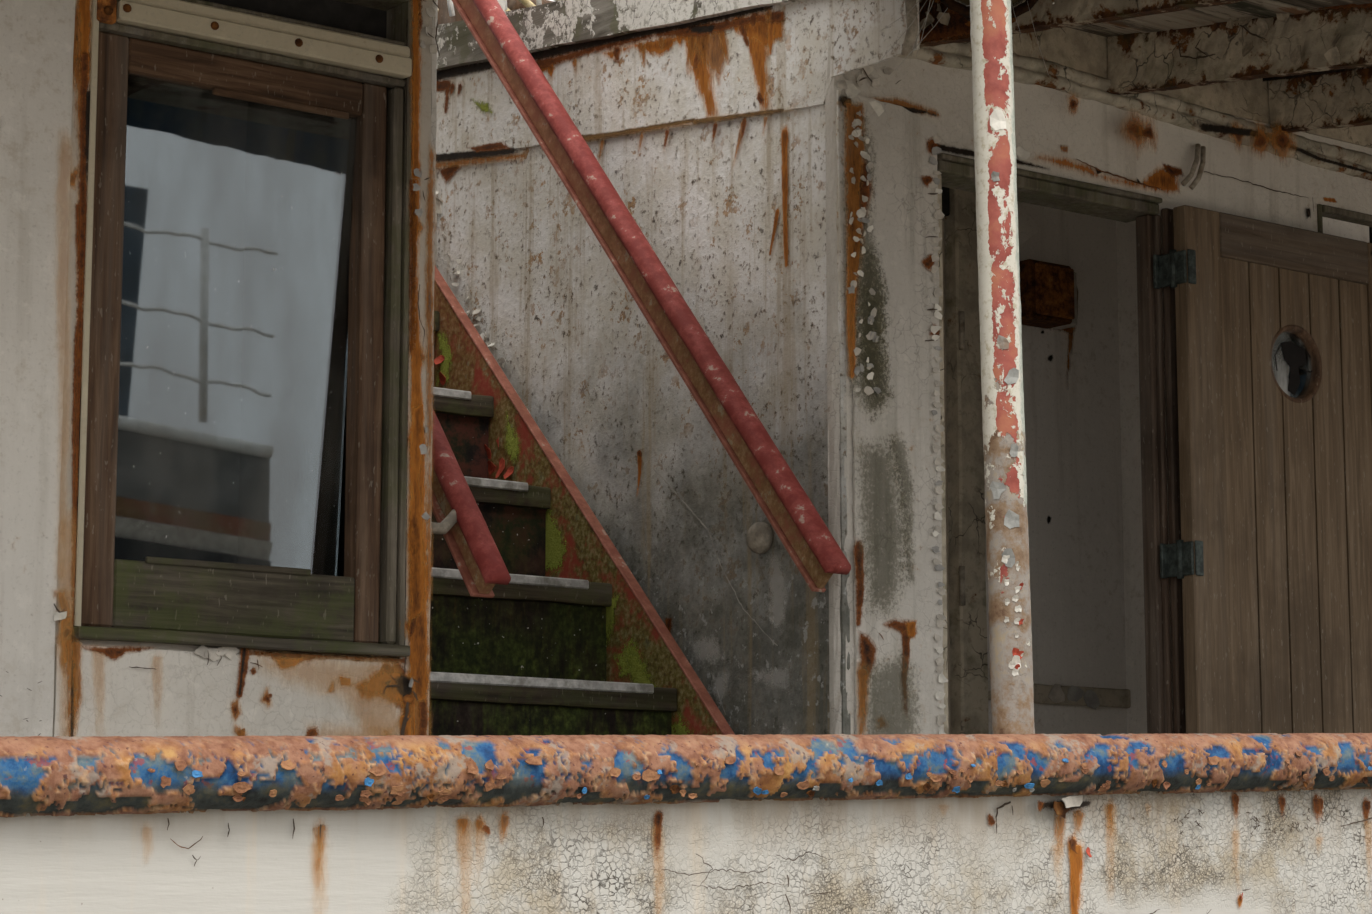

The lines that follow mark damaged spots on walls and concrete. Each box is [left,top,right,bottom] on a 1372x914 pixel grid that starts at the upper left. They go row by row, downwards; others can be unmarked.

rust [531,6,788,267]
rust [938,144,974,157]
peeling [990,109,1006,130]
rust [1016,146,1183,193]
rust [1120,113,1157,149]
rust [1199,123,1372,175]
rust [54,0,155,737]
rust [232,0,525,736]
peeling [990,481,1020,529]
rust [1313,794,1323,819]
rust [1363,798,1371,823]
rust [1055,810,1084,914]